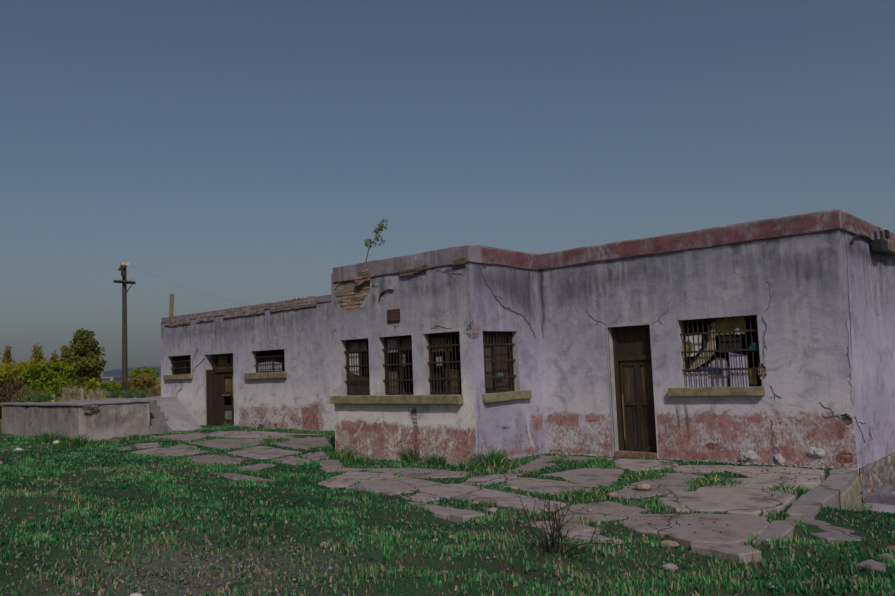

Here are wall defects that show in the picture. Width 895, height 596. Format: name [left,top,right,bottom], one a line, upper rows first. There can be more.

flaking render [164,296,317,326]
flaking render [331,268,372,313]
crack [431,264,537,340]
crack [762,275,774,362]
crack [176,349,205,397]
peeling [239,403,324,430]
peeling [335,408,476,464]
peeling [489,411,612,456]
peeling [657,408,858,469]
crack [770,385,782,454]